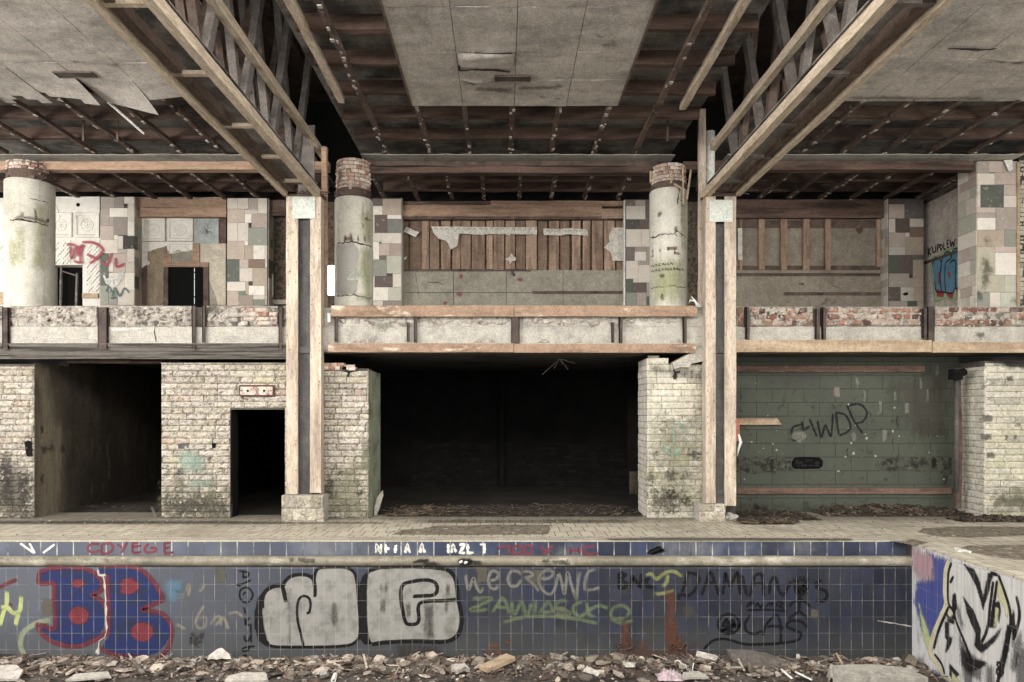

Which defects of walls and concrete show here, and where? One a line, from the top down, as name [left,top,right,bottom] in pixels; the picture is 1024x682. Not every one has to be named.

crack [10,198,60,226]
water stain [0,373,331,524]
water stain [644,470,694,516]